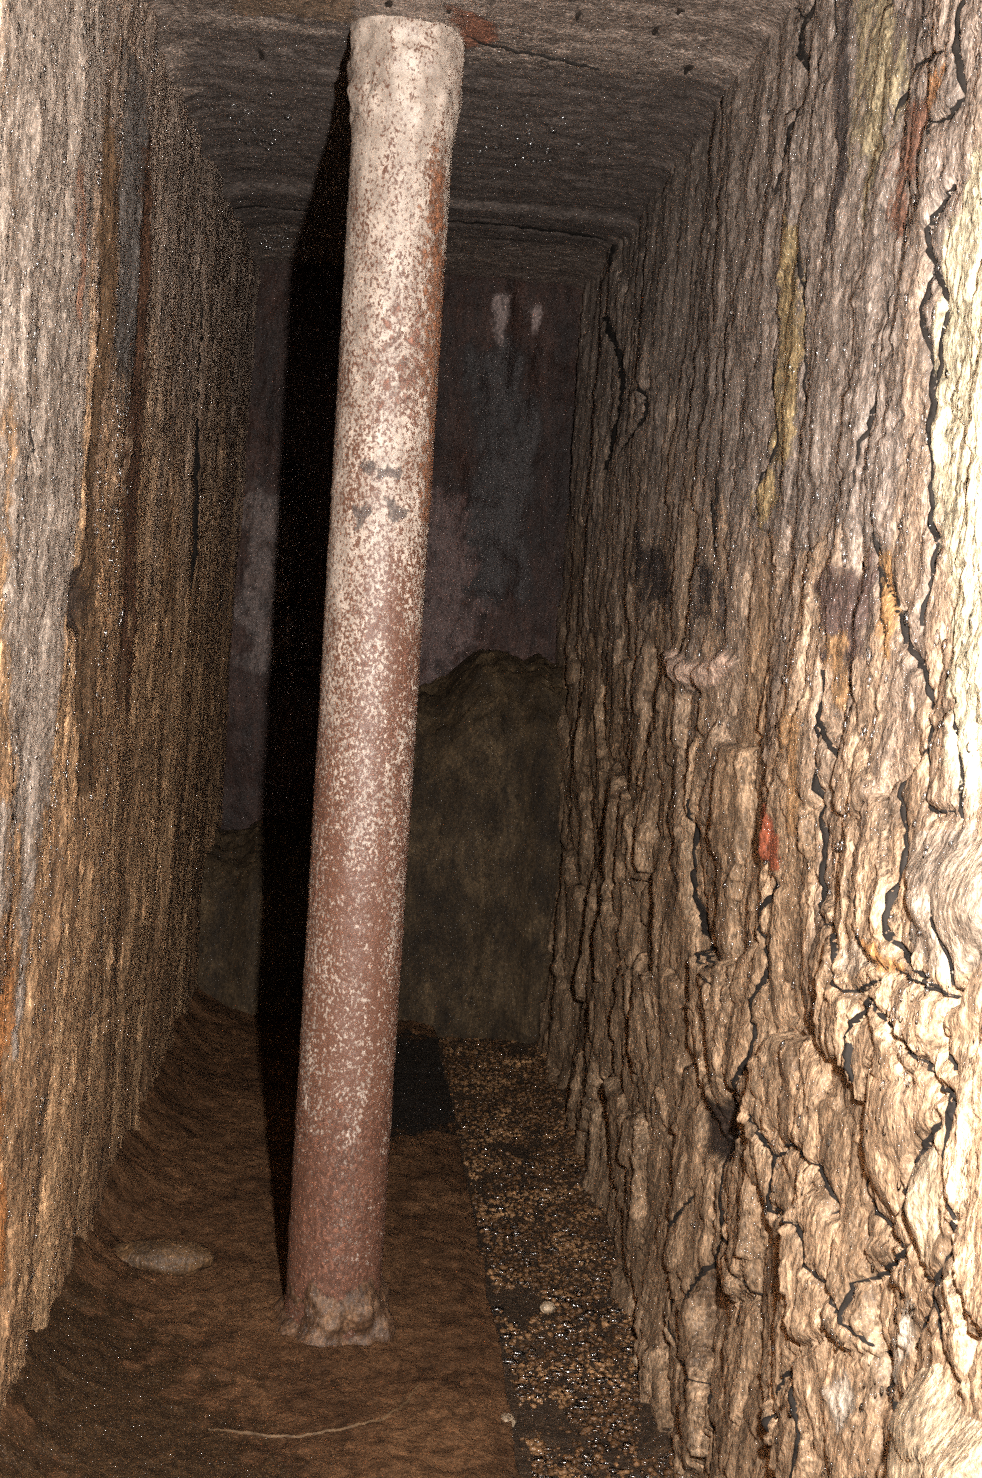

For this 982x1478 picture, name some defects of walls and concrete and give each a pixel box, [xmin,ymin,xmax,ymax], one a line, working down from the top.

crack [774,0,838,195]
crack [892,0,967,134]
crack [710,322,727,553]
rust [309,135,498,974]
crack [686,798,717,984]
crack [730,184,965,1411]
crack [667,1161,763,1471]
crack [761,1370,801,1478]